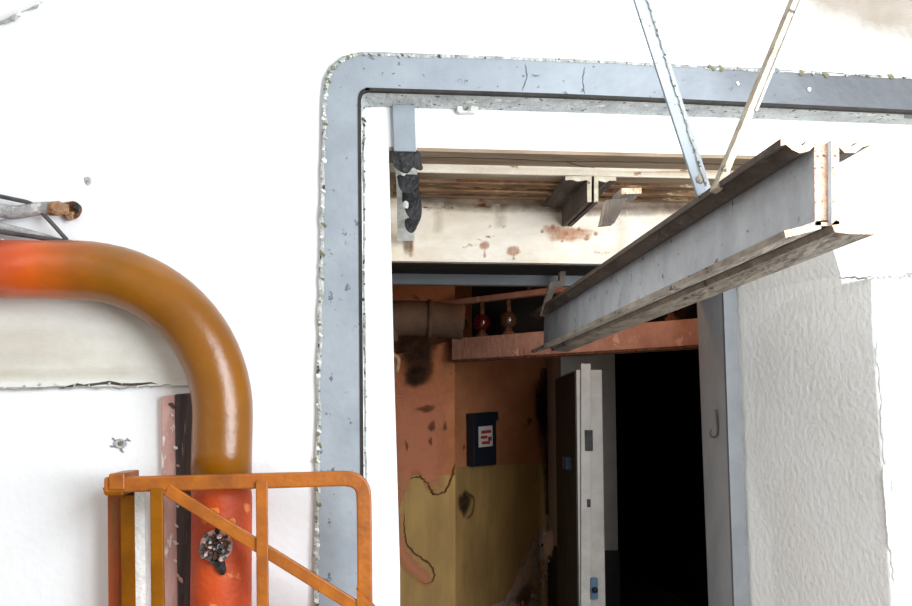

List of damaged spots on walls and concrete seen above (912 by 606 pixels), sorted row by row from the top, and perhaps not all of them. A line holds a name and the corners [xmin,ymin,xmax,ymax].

leakage [811,0,912,38]
rust [541,227,597,242]
crack [0,381,169,390]